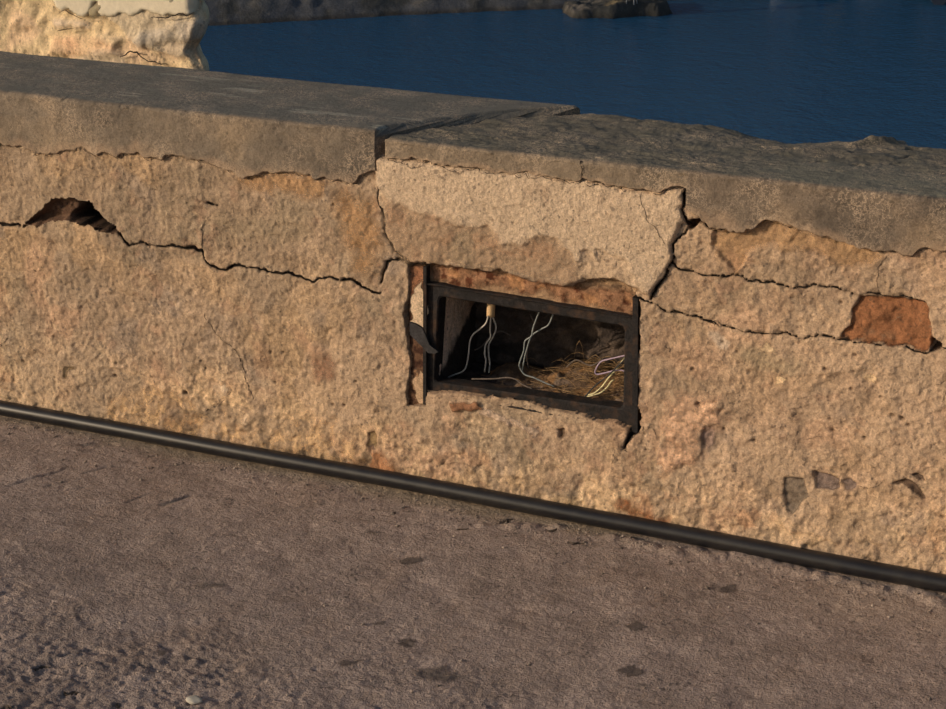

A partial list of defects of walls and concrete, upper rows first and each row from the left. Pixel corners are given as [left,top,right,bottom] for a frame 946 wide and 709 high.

spalling [23,197,119,234]
crack [0,144,946,354]
peeling [410,283,428,327]
rust [410,263,633,314]
spalling [585,278,637,293]
spalling [841,295,942,352]
peeling [412,371,429,404]
spalling [449,402,481,412]
crack [614,429,656,452]
spalling [784,471,856,514]